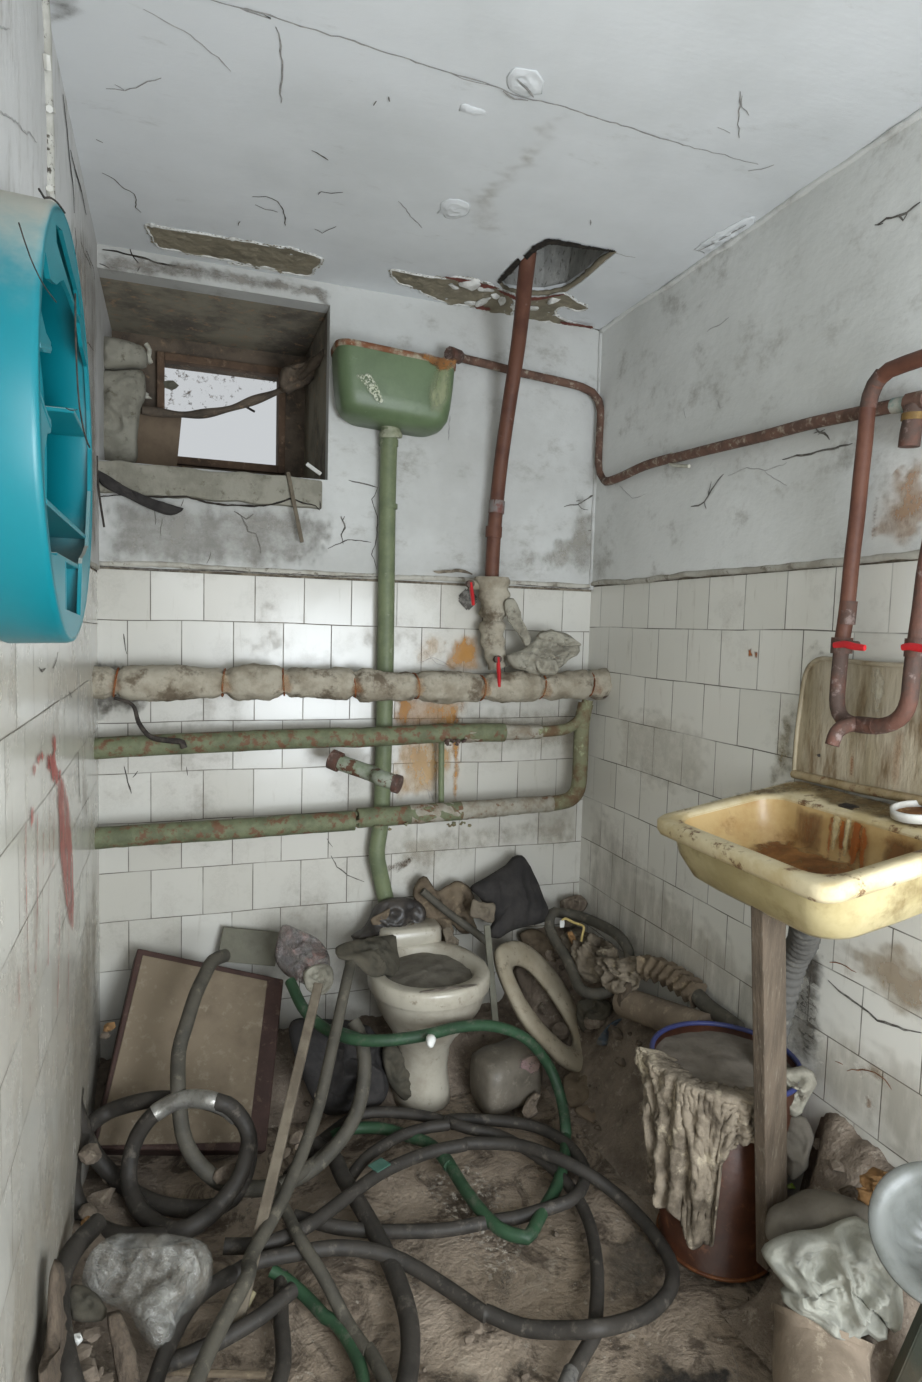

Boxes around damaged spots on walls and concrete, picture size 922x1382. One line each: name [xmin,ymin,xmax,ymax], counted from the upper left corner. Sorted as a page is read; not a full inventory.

crack [143,9,230,70]
crack [106,78,161,91]
crack [212,0,773,171]
flaking render [144,223,324,277]
flaking render [389,239,605,330]
crack [691,429,852,508]
rust [892,470,922,524]
rust [447,637,475,665]
rust [374,701,555,831]